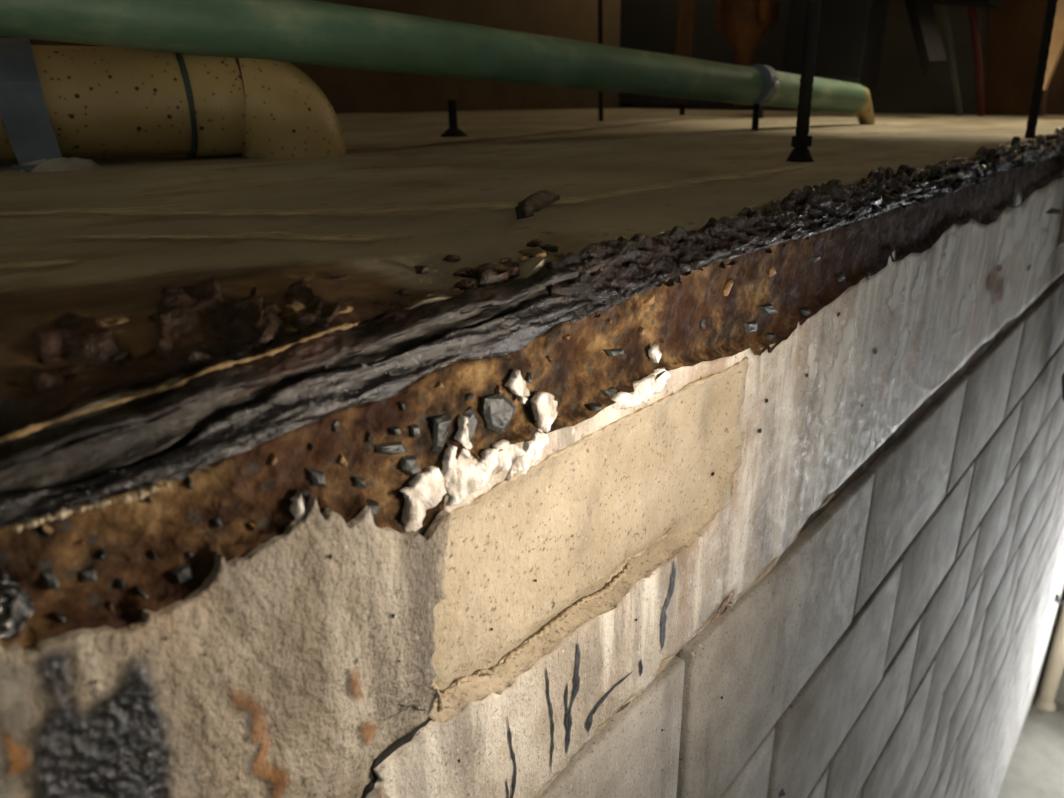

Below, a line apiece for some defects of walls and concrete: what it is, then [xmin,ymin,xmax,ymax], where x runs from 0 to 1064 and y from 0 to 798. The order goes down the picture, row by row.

spalling [0,154,1064,651]
crack [361,704,432,798]
crack [506,717,517,798]
crack [546,561,676,768]